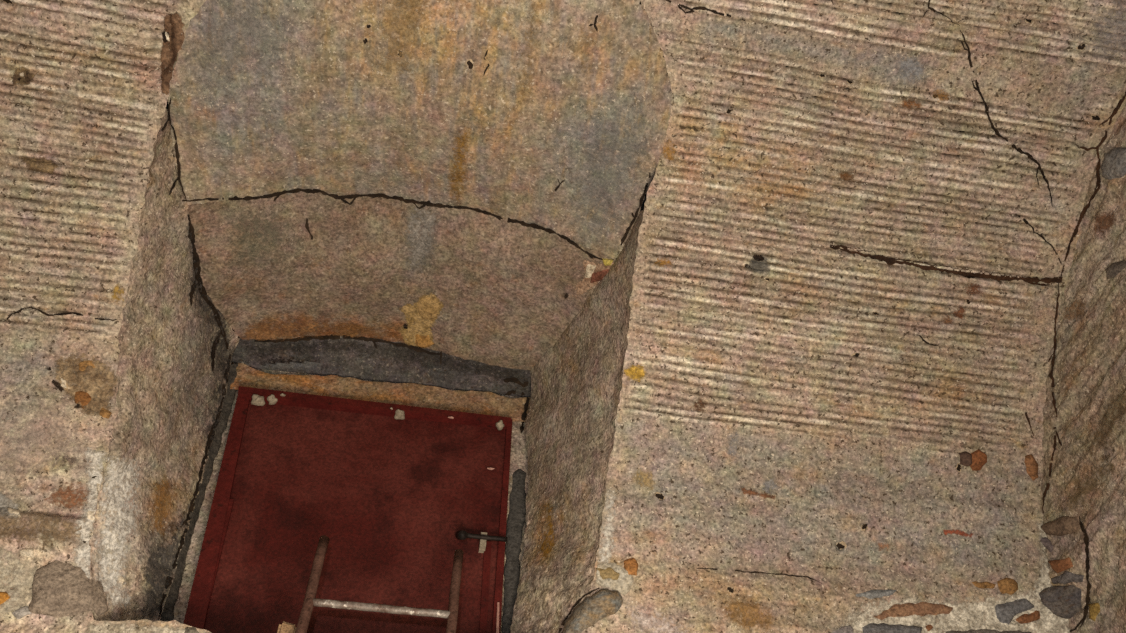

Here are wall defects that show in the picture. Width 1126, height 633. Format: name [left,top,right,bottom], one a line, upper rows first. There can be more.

crack [666,0,745,21]
crack [923,0,1053,207]
crack [158,98,651,621]
crack [830,92,1126,514]
crack [1070,516,1091,632]